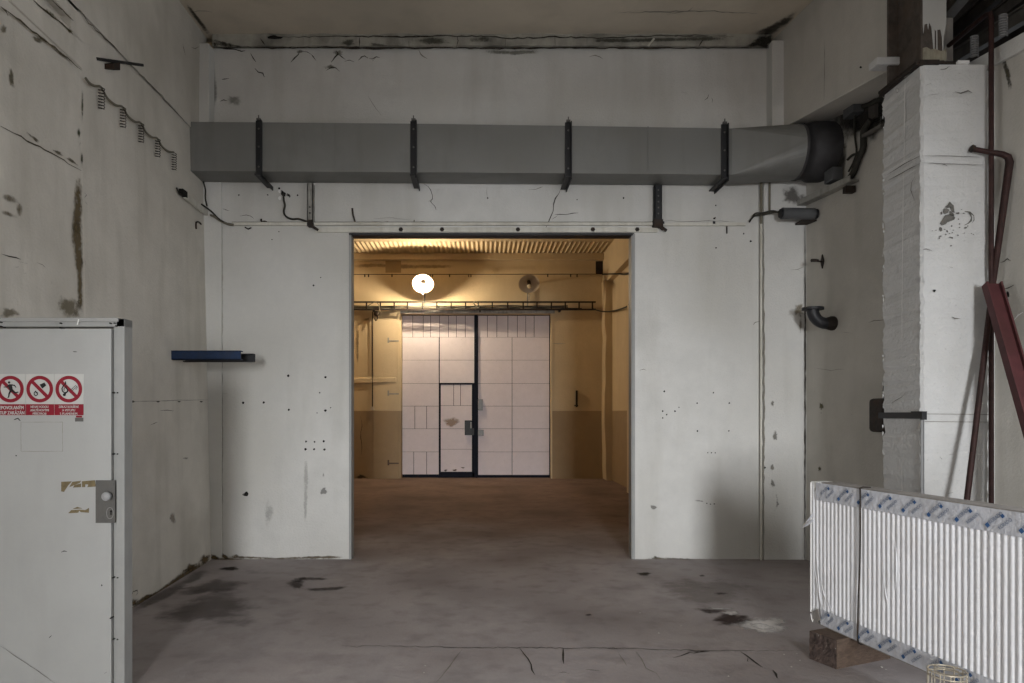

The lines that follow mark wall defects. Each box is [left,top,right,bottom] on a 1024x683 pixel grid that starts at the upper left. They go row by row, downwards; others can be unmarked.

crack [1,126,78,169]
leakage [62,181,83,315]
peeling [920,202,974,281]
leakage [132,554,338,607]
leakage [702,607,786,633]
crack [619,650,709,678]